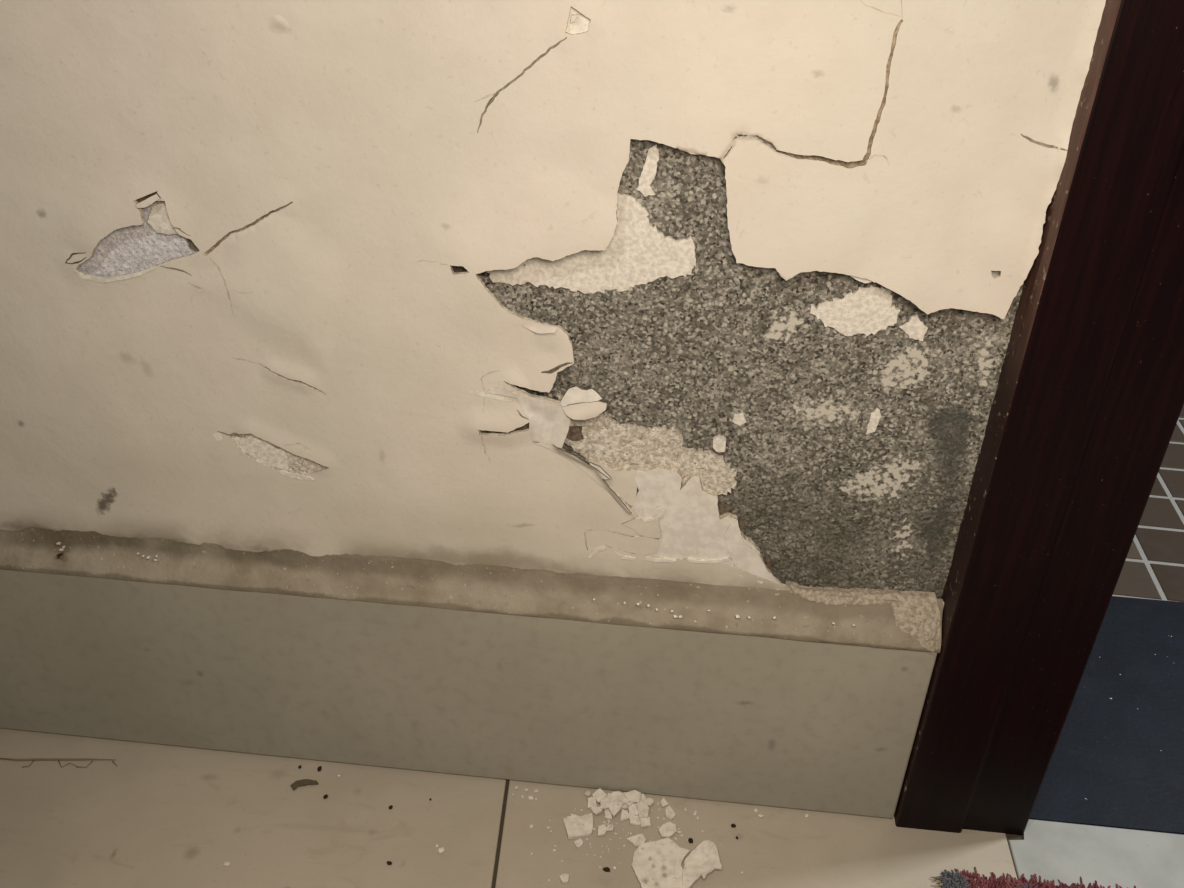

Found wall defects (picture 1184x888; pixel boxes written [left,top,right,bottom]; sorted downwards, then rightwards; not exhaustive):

crack [475,37,567,133]
crack [723,0,903,167]
flaking render [65,191,199,283]
crack [160,202,292,316]
flaking render [468,139,1024,656]
peeling [212,431,327,480]